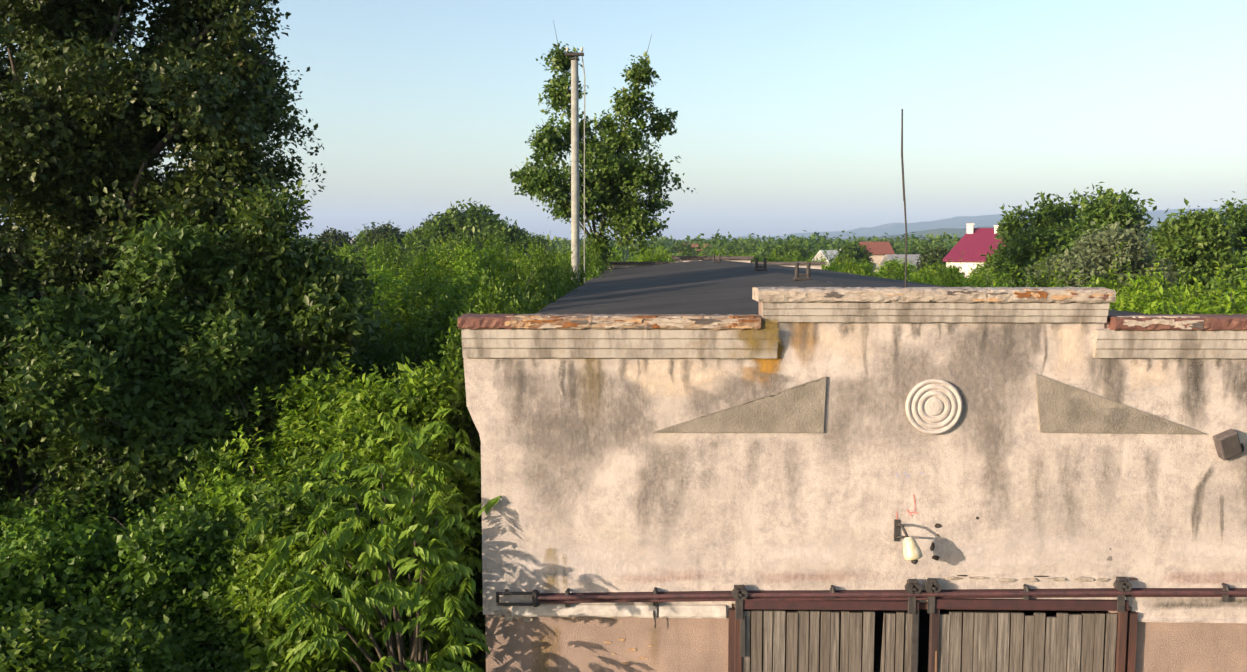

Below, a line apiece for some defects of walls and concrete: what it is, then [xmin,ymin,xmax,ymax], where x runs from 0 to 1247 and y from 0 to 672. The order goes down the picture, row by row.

peeling [505,315,758,329]
corrosion [741,320,812,384]
damp [1148,358,1221,418]
damp [496,358,653,497]
damp [1192,469,1211,525]